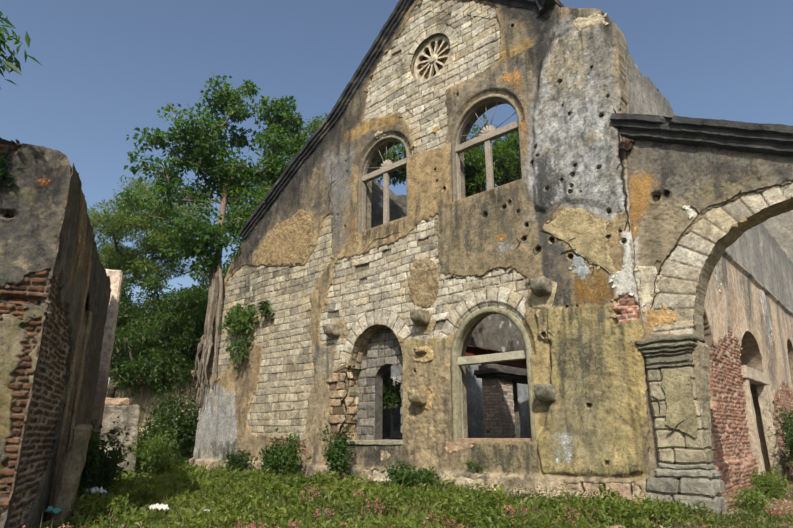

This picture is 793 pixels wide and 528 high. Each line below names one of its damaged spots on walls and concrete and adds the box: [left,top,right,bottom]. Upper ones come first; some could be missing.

spalling [364,0,501,156]
leakage [536,153,559,225]
crack [515,230,611,276]
crack [613,108,630,232]
crack [650,181,793,309]
spalling [0,270,71,528]
spalling [207,214,530,453]
spalling [364,450,392,482]
leakage [557,331,604,422]
leakage [554,435,641,478]
spalling [709,327,759,496]